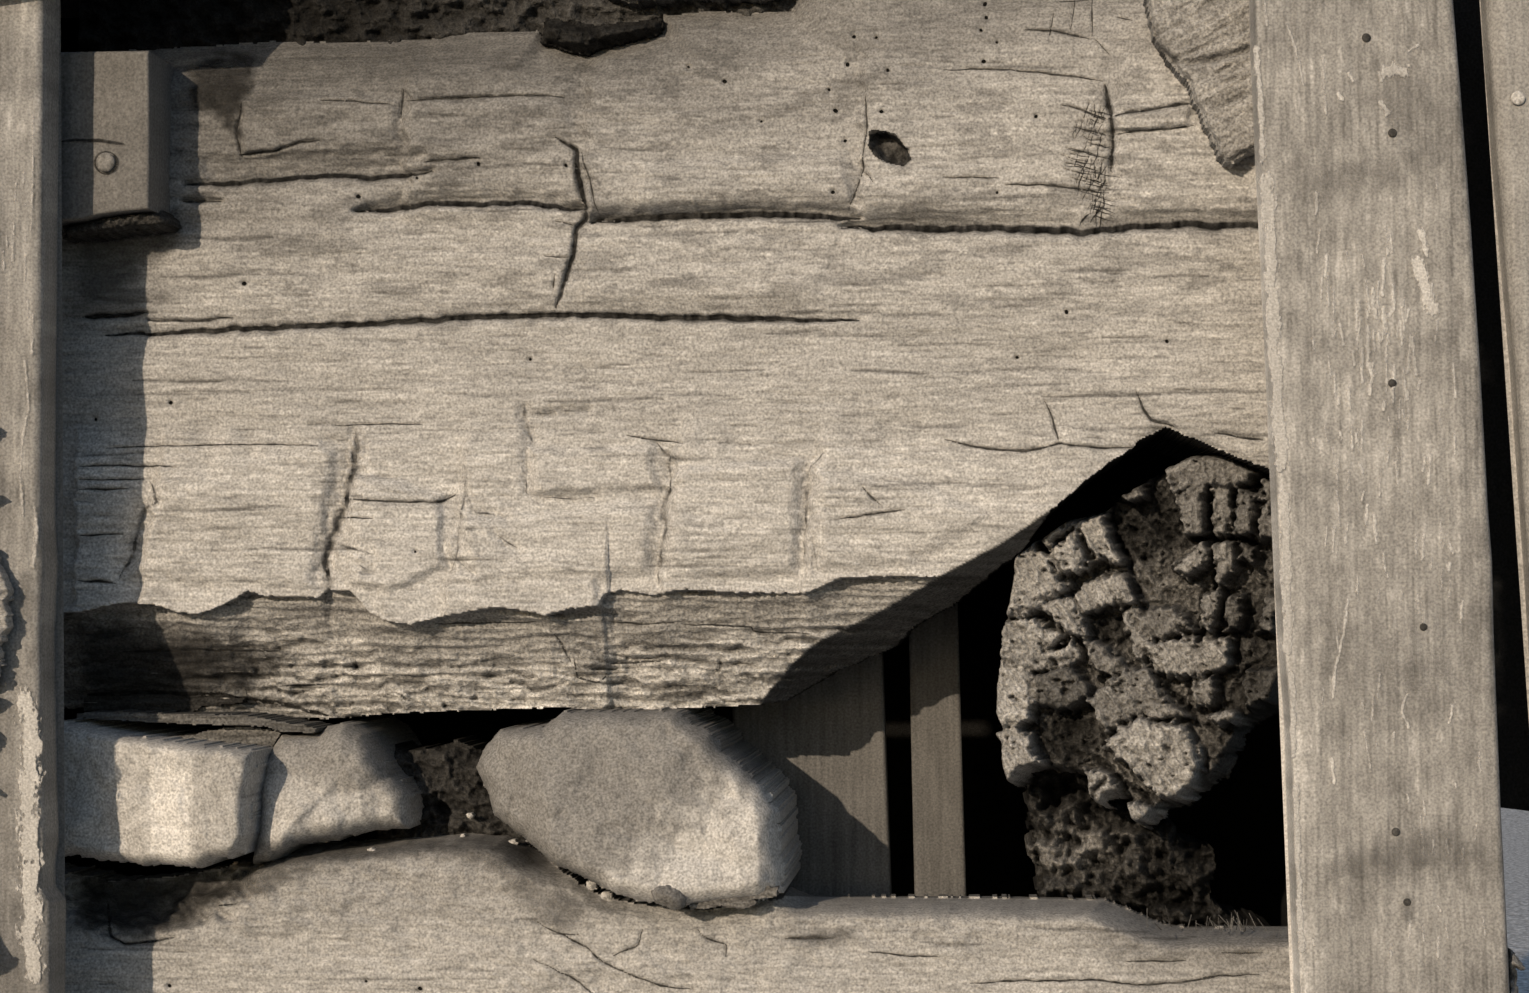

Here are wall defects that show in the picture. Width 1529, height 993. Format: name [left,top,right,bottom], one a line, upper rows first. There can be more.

damp [189,52,252,136]
crack [83,0,1258,336]
crack [626,435,683,444]
crack [533,920,690,993]
crack [785,934,829,942]
crack [871,950,936,958]
crack [970,952,1260,986]